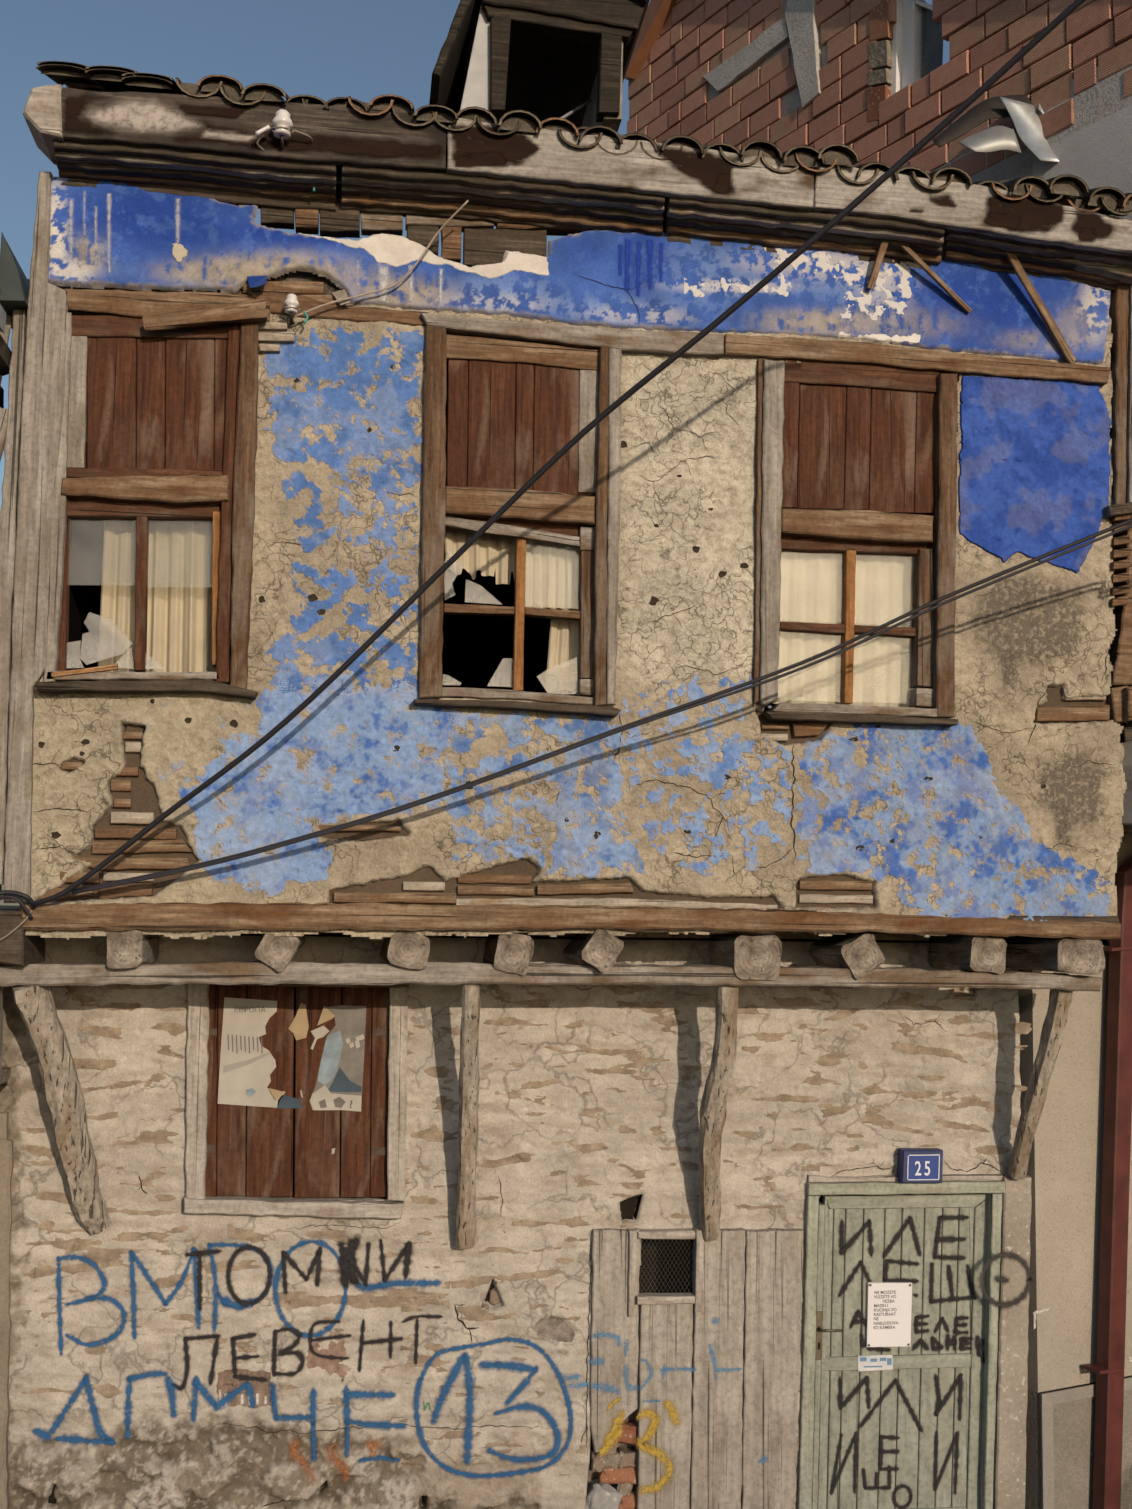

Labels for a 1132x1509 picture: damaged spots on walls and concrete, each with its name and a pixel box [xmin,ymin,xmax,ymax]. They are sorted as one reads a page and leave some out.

spalling [171,243,188,263]
peeling [299,233,549,279]
peeling [247,276,267,288]
peeling [332,289,351,306]
peeling [684,247,921,345]
peeling [37,325,1113,921]